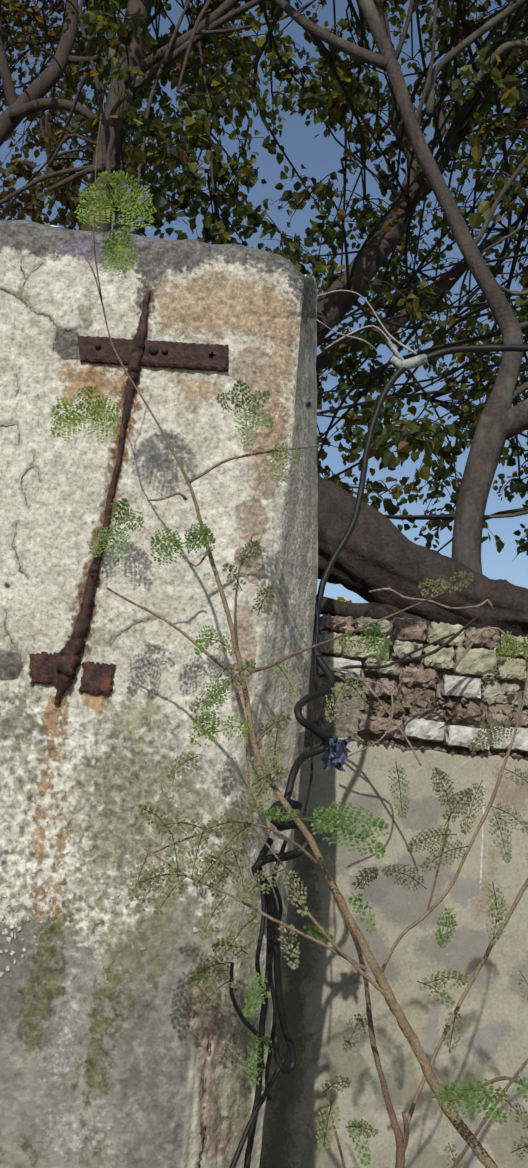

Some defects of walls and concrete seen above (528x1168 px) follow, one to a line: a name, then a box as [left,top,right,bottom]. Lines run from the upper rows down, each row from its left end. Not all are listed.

crack [0,260,79,351]
crack [0,374,40,506]
rust [58,363,142,656]
leakage [457,1118,488,1168]